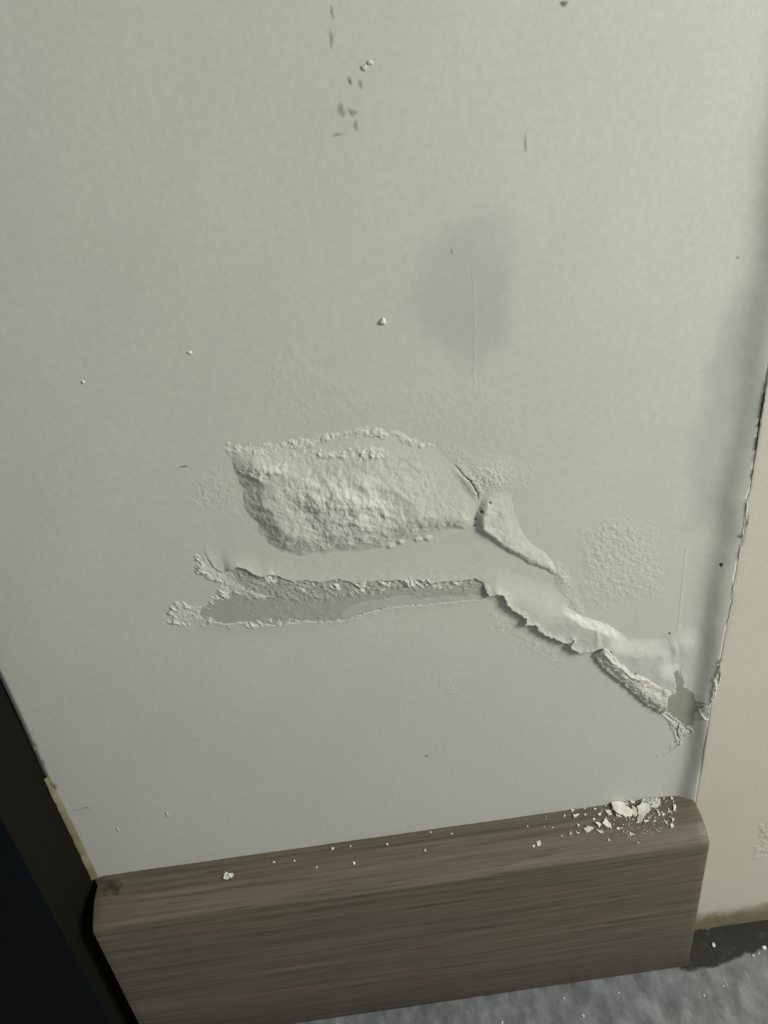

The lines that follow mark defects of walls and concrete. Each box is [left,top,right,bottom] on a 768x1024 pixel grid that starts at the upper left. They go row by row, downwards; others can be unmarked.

peeling [166,527,723,734]